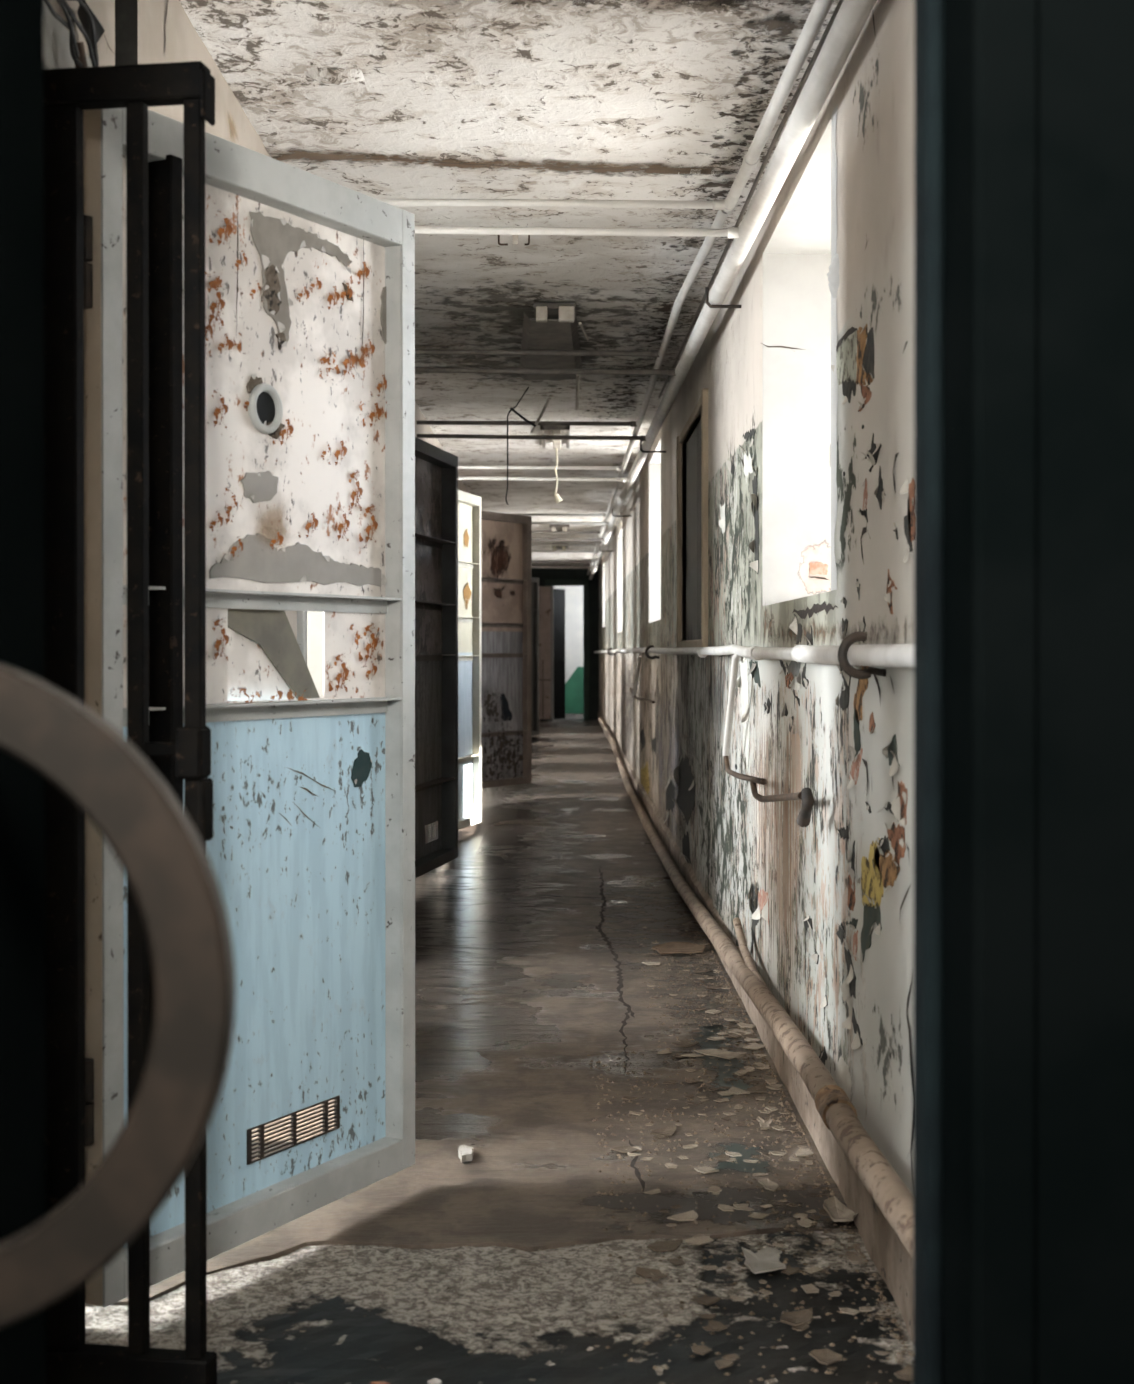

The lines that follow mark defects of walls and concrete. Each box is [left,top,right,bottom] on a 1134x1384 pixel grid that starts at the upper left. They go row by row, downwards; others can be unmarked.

water stain [266,0,827,419]
corrosion [205,210,247,357]
peeling [249,211,353,353]
corrosion [297,261,374,310]
corrosion [319,339,375,380]
water stain [842,378,856,405]
peeling [209,533,387,586]
corrosion [321,440,380,548]
peeling [831,324,914,614]
peeling [820,734,908,1049]
crack [536,864,639,1073]
crack [629,1140,645,1191]